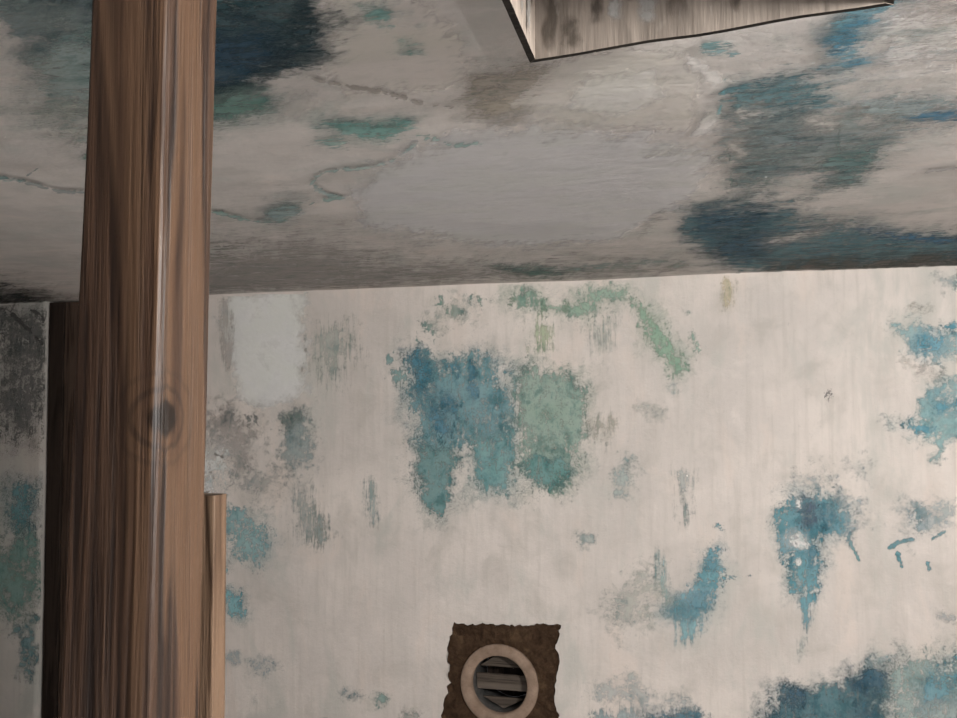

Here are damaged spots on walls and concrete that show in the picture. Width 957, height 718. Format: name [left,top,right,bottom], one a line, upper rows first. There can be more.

damp [0,0,92,143]
damp [213,0,329,123]
crack [0,168,84,194]
crack [212,143,417,225]
damp [677,0,957,307]
damp [206,234,701,524]
damp [890,321,957,462]
peeling [204,449,231,493]
damp [604,546,734,644]
damp [774,479,860,629]
flaking render [441,620,561,718]
damp [757,652,957,718]